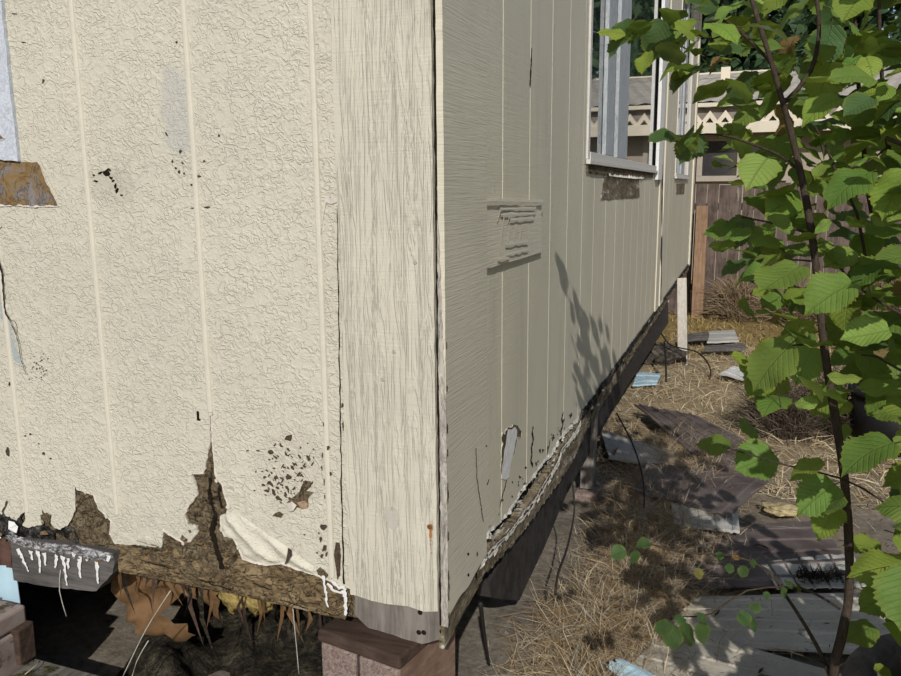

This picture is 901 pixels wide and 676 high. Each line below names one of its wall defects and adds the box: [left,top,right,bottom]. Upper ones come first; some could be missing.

peeling [0,160,59,208]
peeling [92,168,123,196]
crack [0,259,26,374]
spalling [62,486,113,546]
spalling [155,411,581,649]